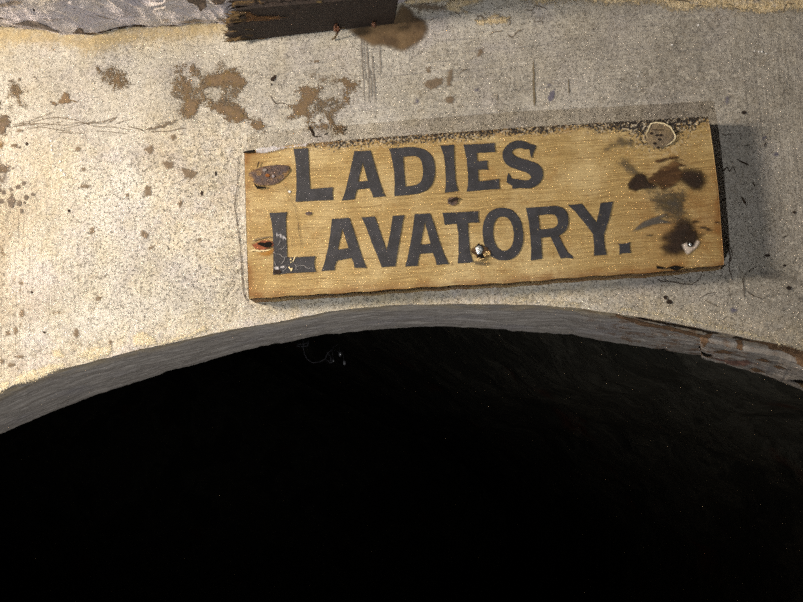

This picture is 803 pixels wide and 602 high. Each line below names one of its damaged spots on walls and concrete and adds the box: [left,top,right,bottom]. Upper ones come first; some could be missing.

water stain [0,163,34,213]
peeling [615,315,803,367]